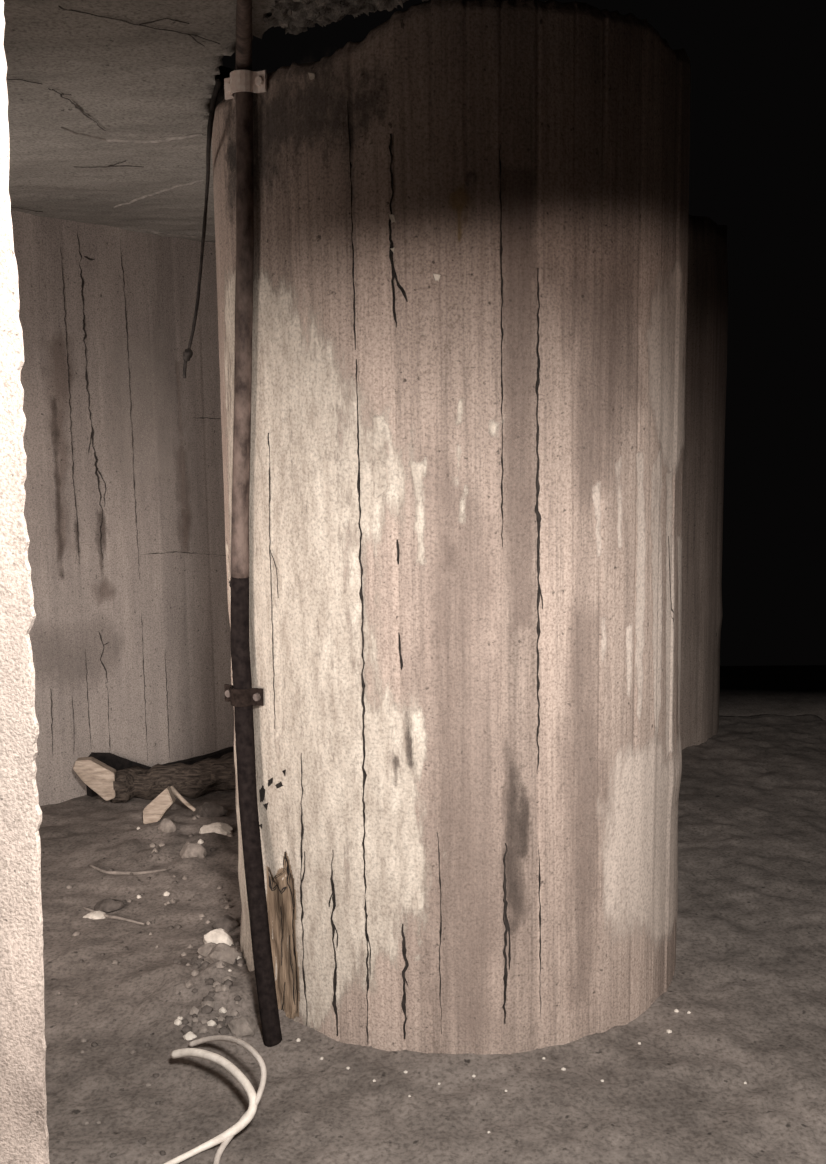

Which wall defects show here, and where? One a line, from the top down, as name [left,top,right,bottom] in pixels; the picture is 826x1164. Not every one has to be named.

crack [8,79,106,131]
crack [58,6,220,47]
spalling [263,0,408,35]
crack [389,133,408,327]
crack [60,235,226,577]
crack [300,101,371,1041]
crack [535,268,543,774]
damp [506,772,528,910]
crack [401,924,409,1039]
crack [435,832,443,1034]
crack [502,843,511,1024]
crack [536,857,544,1013]